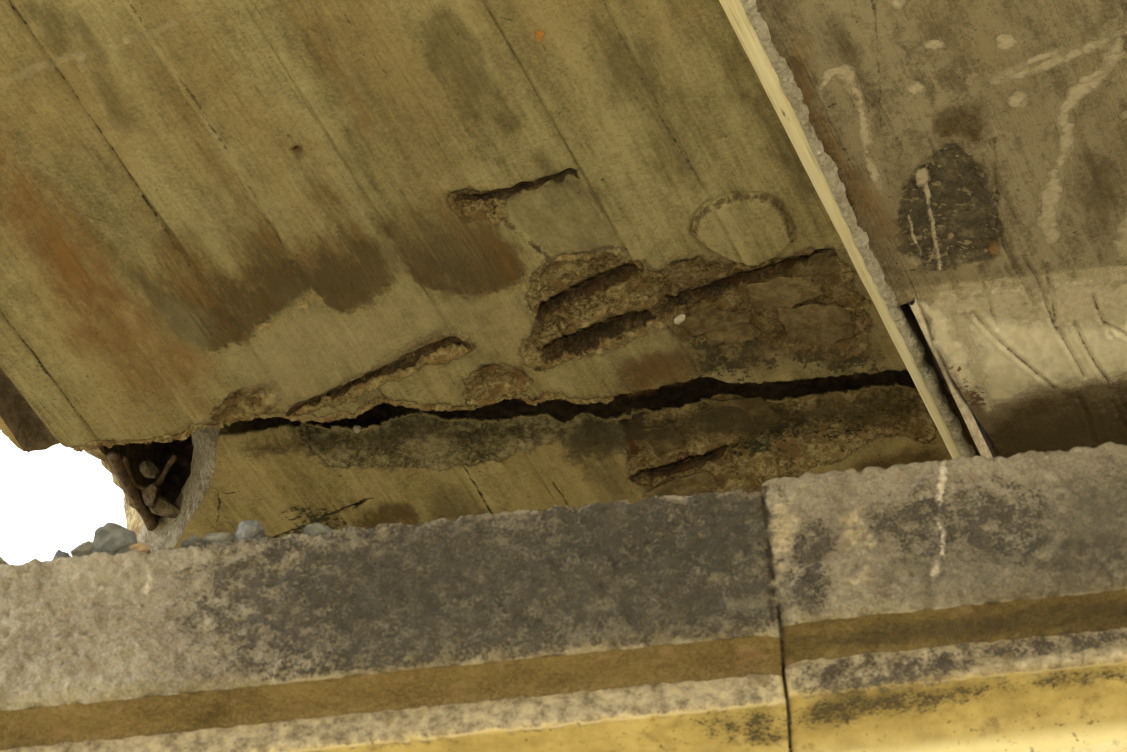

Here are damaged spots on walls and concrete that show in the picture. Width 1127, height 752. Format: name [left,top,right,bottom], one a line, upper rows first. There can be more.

spalling [447,168,579,229]
damp [152,224,393,351]
spalling [72,193,936,519]
damp [358,504,418,530]
crack [761,485,774,622]
damp [698,627,1127,746]